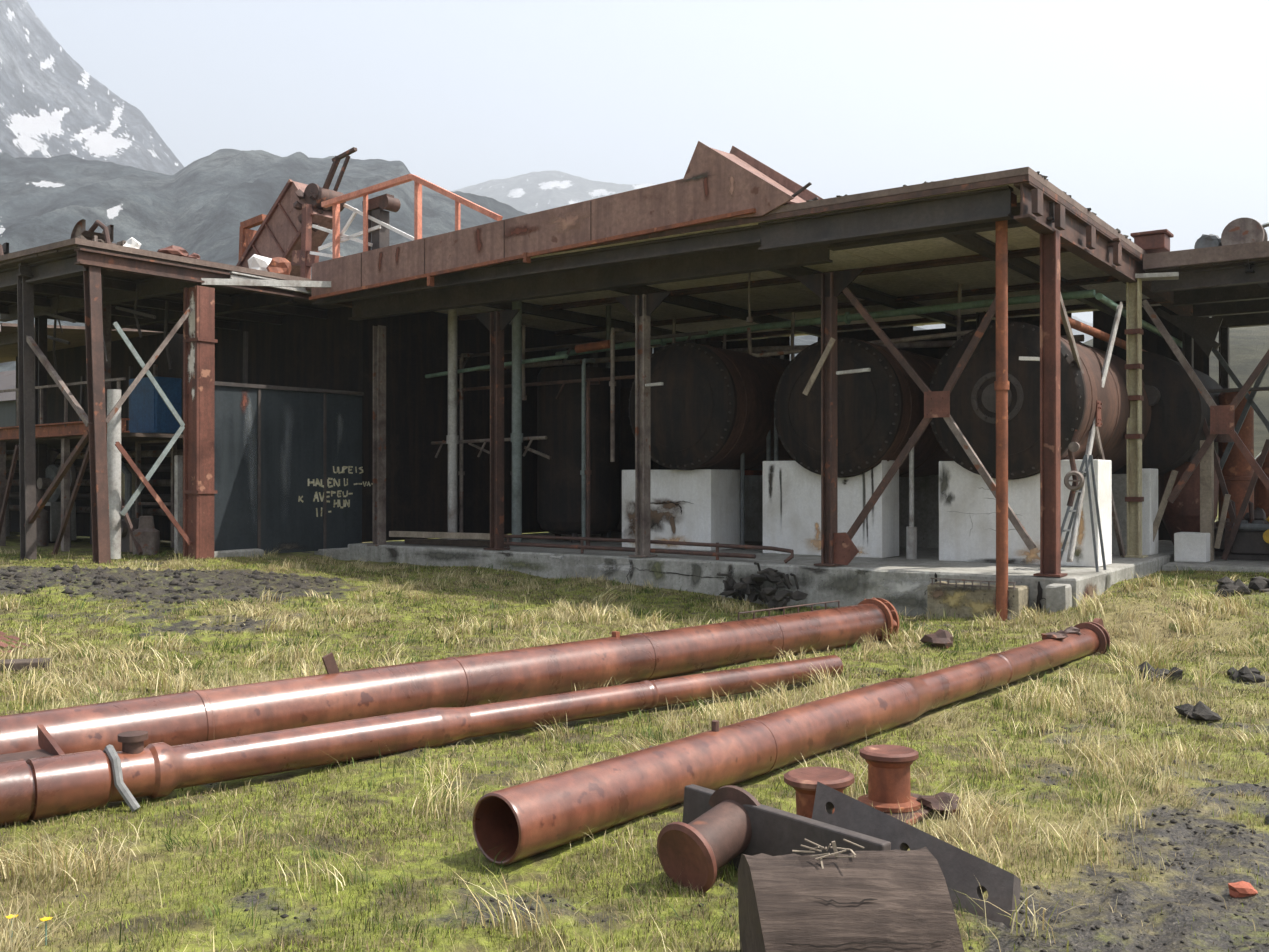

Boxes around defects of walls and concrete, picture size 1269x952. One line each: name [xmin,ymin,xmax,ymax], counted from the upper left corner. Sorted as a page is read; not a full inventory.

leakage [769,466,782,514]